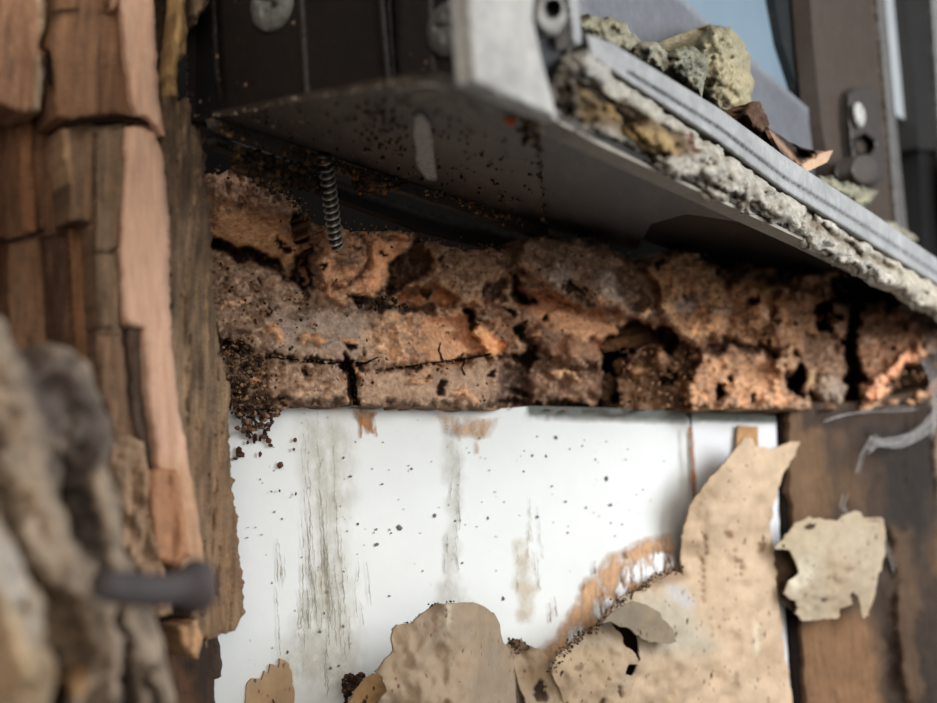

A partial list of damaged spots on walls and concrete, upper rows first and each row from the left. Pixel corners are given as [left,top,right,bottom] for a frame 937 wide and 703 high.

crack [42,48,53,86]
crack [63,115,150,129]
crack [269,342,491,405]
damp [295,477,367,694]
peeling [506,425,800,703]
peeling [348,673,385,703]